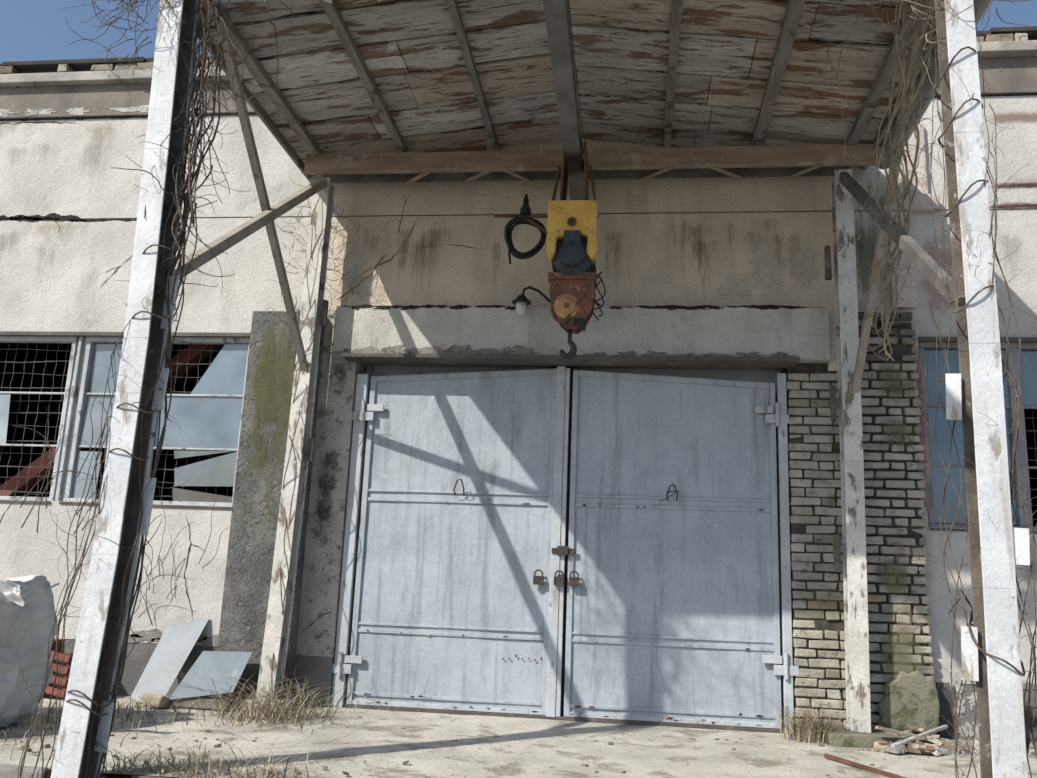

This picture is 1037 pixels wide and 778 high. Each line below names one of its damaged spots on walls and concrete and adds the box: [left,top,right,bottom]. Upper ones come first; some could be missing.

peeling [0,107,91,117]
peeling [106,105,149,113]
corrosion [993,179,1037,187]
crack [0,213,137,232]
crack [609,303,824,311]
leakage [255,336,296,436]
leakage [317,452,337,527]